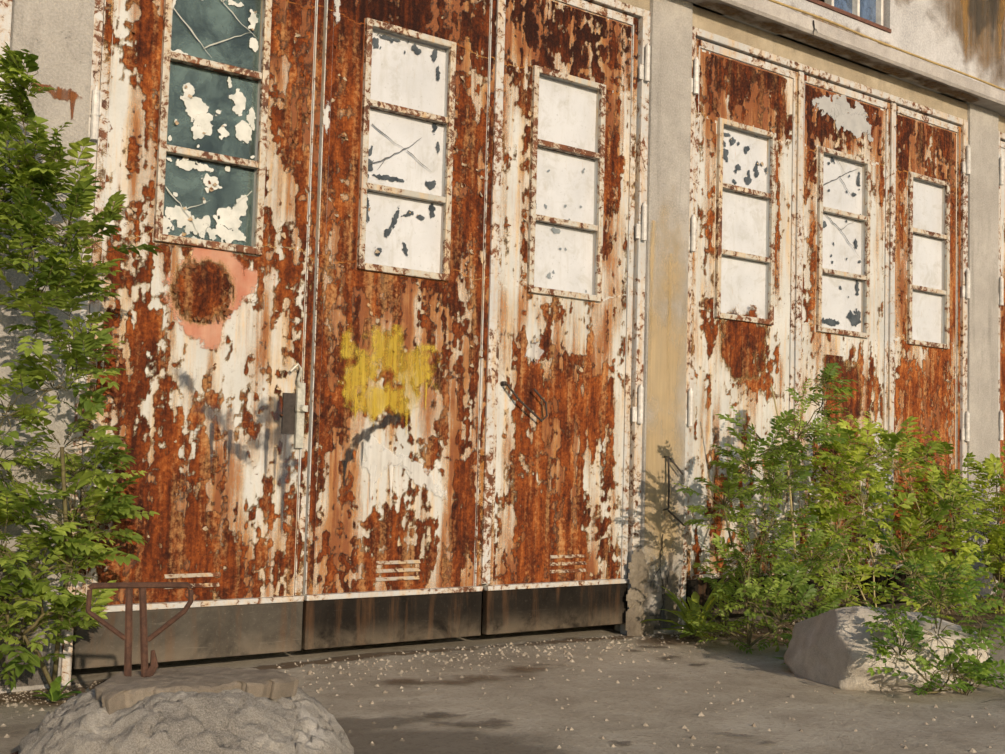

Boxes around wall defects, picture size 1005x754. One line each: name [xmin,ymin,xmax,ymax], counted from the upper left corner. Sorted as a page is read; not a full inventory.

peeling [228,0,258,52]
damp [946,0,1005,79]
peeling [180,77,256,148]
peeling [162,156,258,350]
corrosion [78,0,639,605]
corrosion [687,39,961,575]
peeling [526,338,543,362]